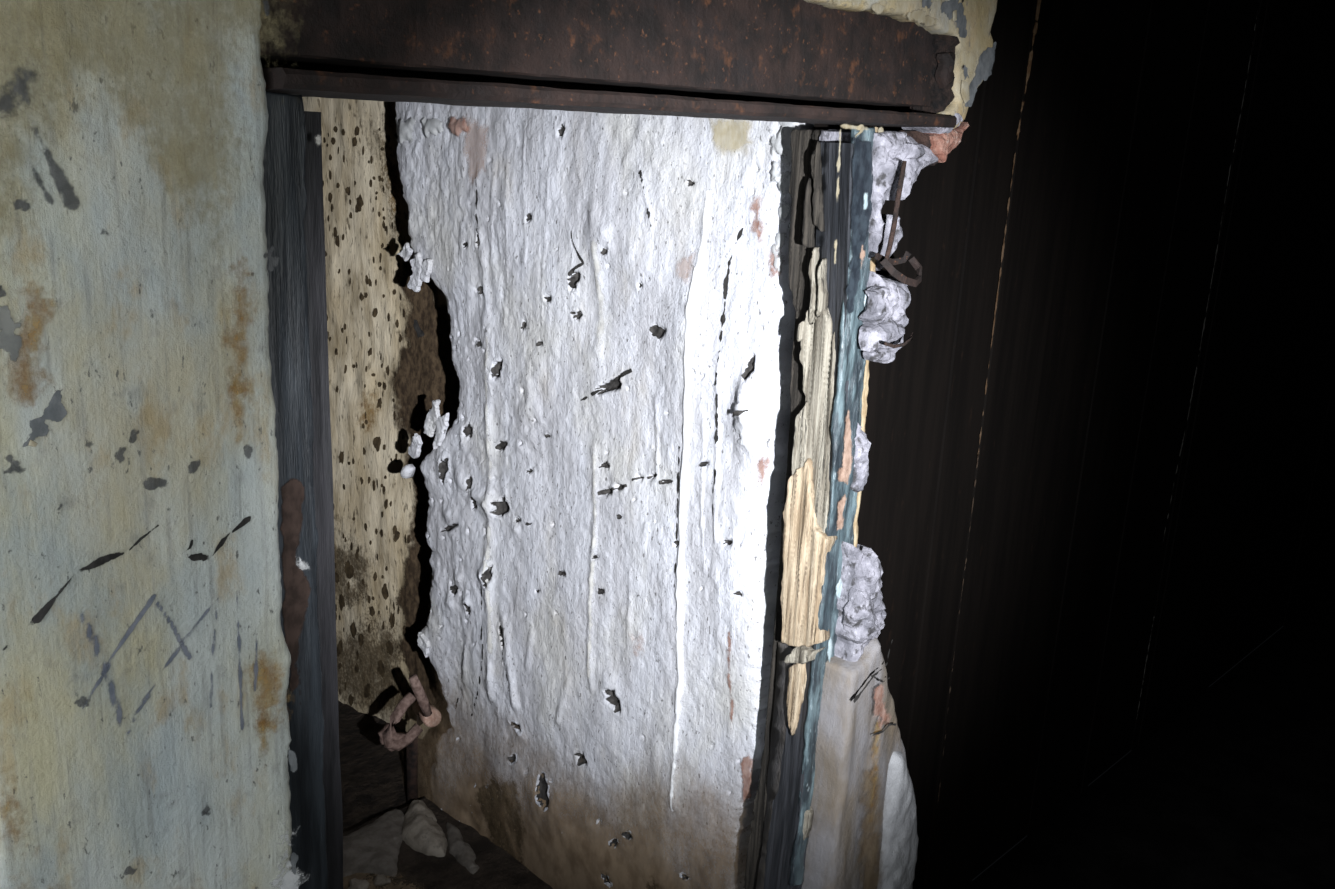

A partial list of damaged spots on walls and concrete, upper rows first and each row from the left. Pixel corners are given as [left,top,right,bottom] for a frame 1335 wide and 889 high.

rust [910,34,964,114]
flaking render [395,117,469,144]
flaking render [819,129,851,143]
peeling [769,122,795,271]
flaking render [858,42,996,363]
peeling [397,243,433,292]
damp [323,110,410,717]
peeling [400,399,473,483]
spalling [466,476,532,526]
damp [418,190,743,889]
flaking render [834,411,887,662]
peeling [417,632,430,658]